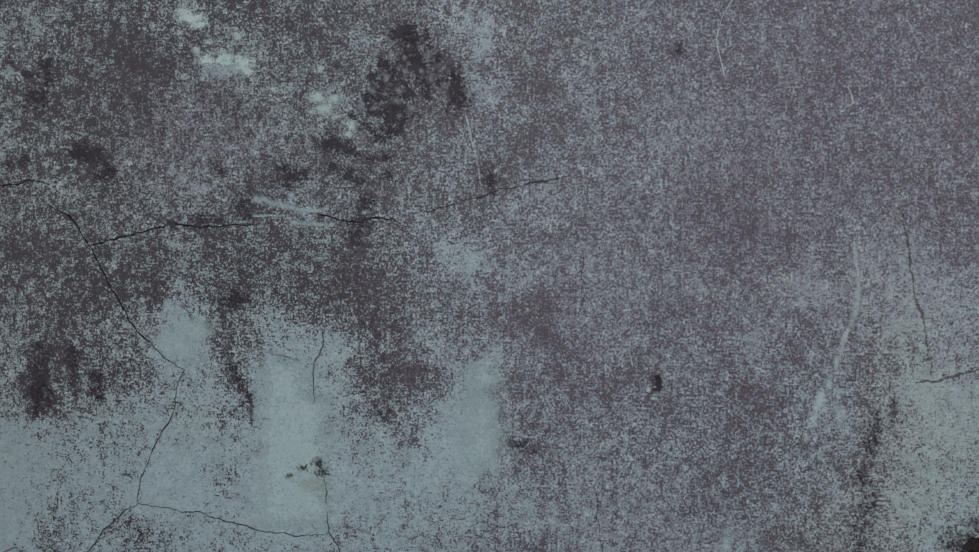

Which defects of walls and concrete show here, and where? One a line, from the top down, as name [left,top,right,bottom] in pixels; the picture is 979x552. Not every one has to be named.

crack [0,179,340,552]
peeling [255,351,337,530]
crack [306,212,397,223]
crack [423,176,567,213]
crack [902,214,979,383]